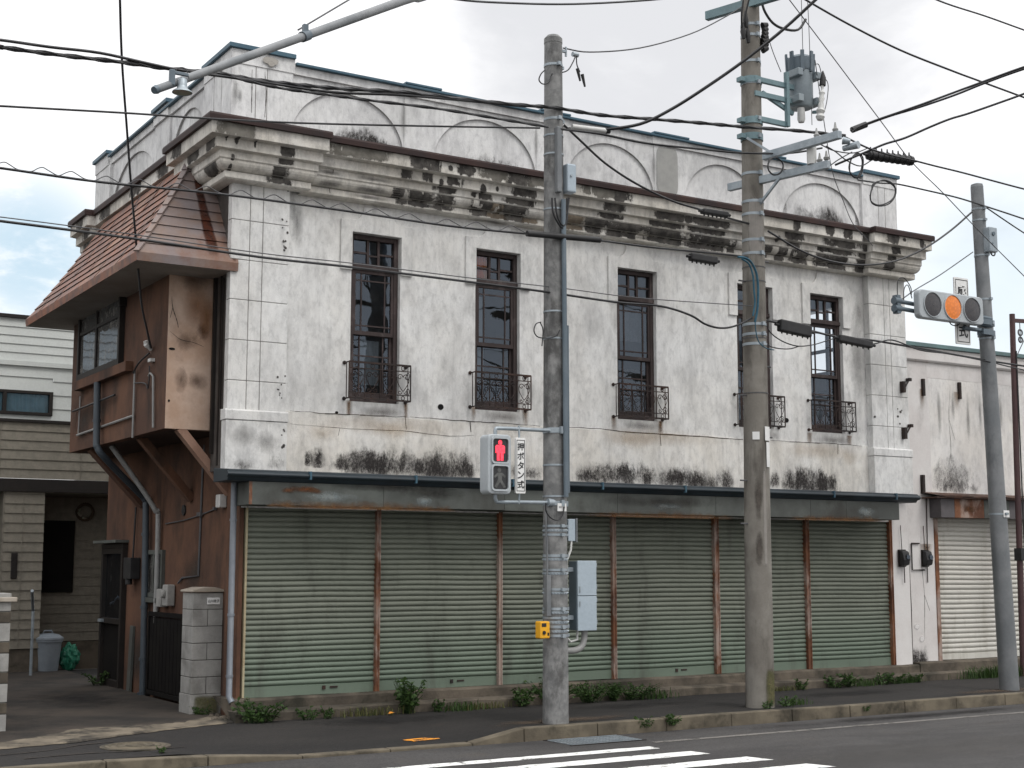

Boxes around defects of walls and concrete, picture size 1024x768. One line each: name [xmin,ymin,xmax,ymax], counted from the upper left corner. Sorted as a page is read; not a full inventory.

peeling [391,156,537,224]
peeling [566,191,737,253]
peeling [765,221,869,273]
peeling [883,234,906,271]
water stain [336,451,473,489]
water stain [578,465,733,487]
water stain [770,469,836,491]